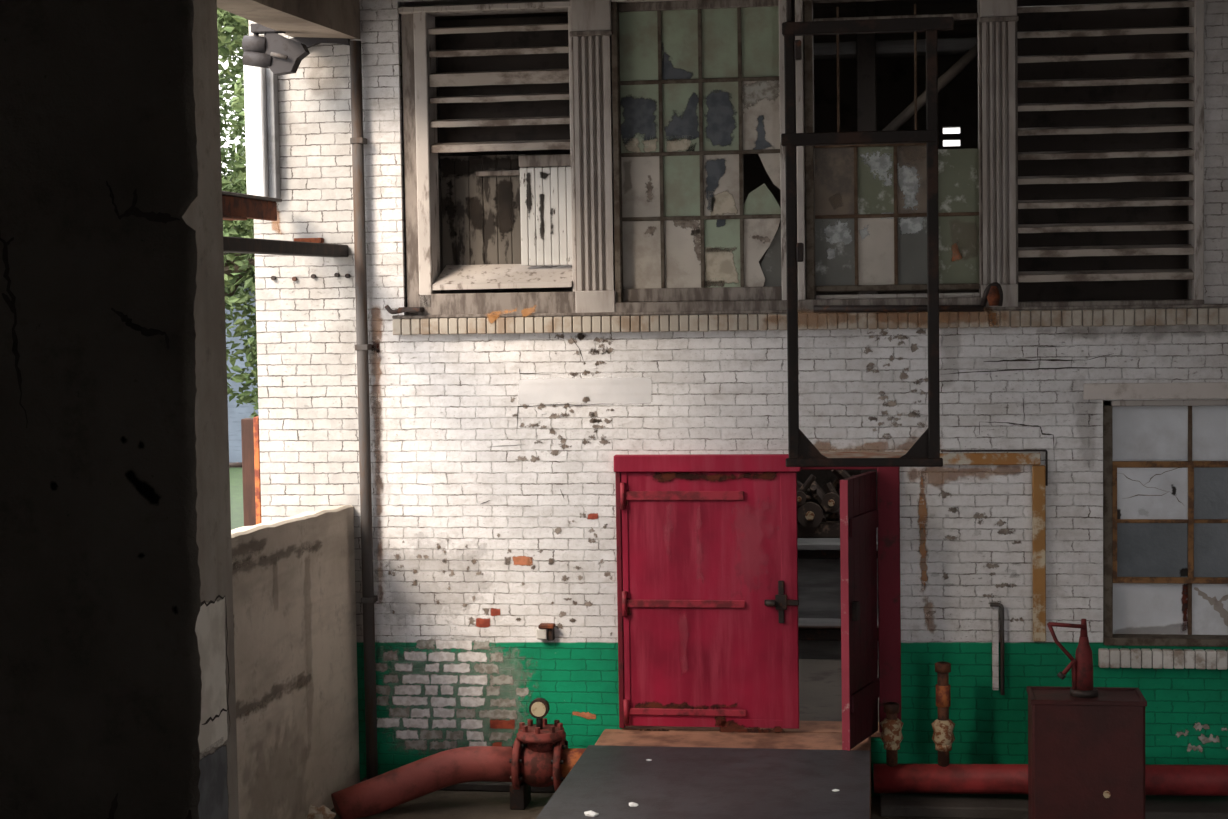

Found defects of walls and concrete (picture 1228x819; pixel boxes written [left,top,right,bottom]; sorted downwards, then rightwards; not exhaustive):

crack [0,237,28,428]
peeling [555,333,614,376]
peeling [864,329,928,439]
corrosion [370,308,383,600]
peeling [510,397,614,462]
corrosion [814,438,915,452]
peeling [385,541,483,590]
peeling [554,513,608,543]
corrosion [910,465,1020,632]
peeling [551,598,593,629]
peeling [375,594,529,750]
peeling [1176,722,1228,752]